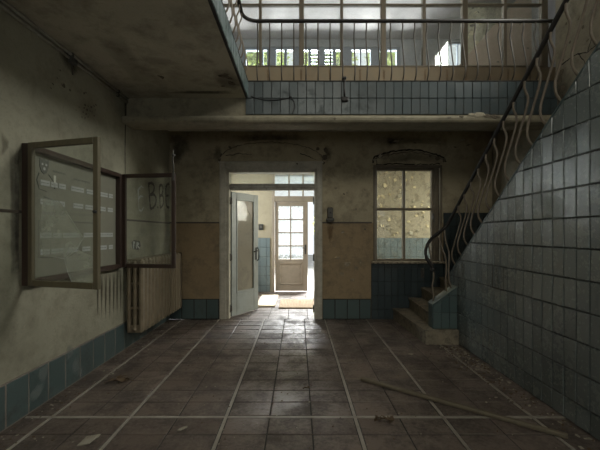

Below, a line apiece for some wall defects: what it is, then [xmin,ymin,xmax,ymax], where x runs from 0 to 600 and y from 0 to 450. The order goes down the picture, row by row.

crack [372,149,446,165]